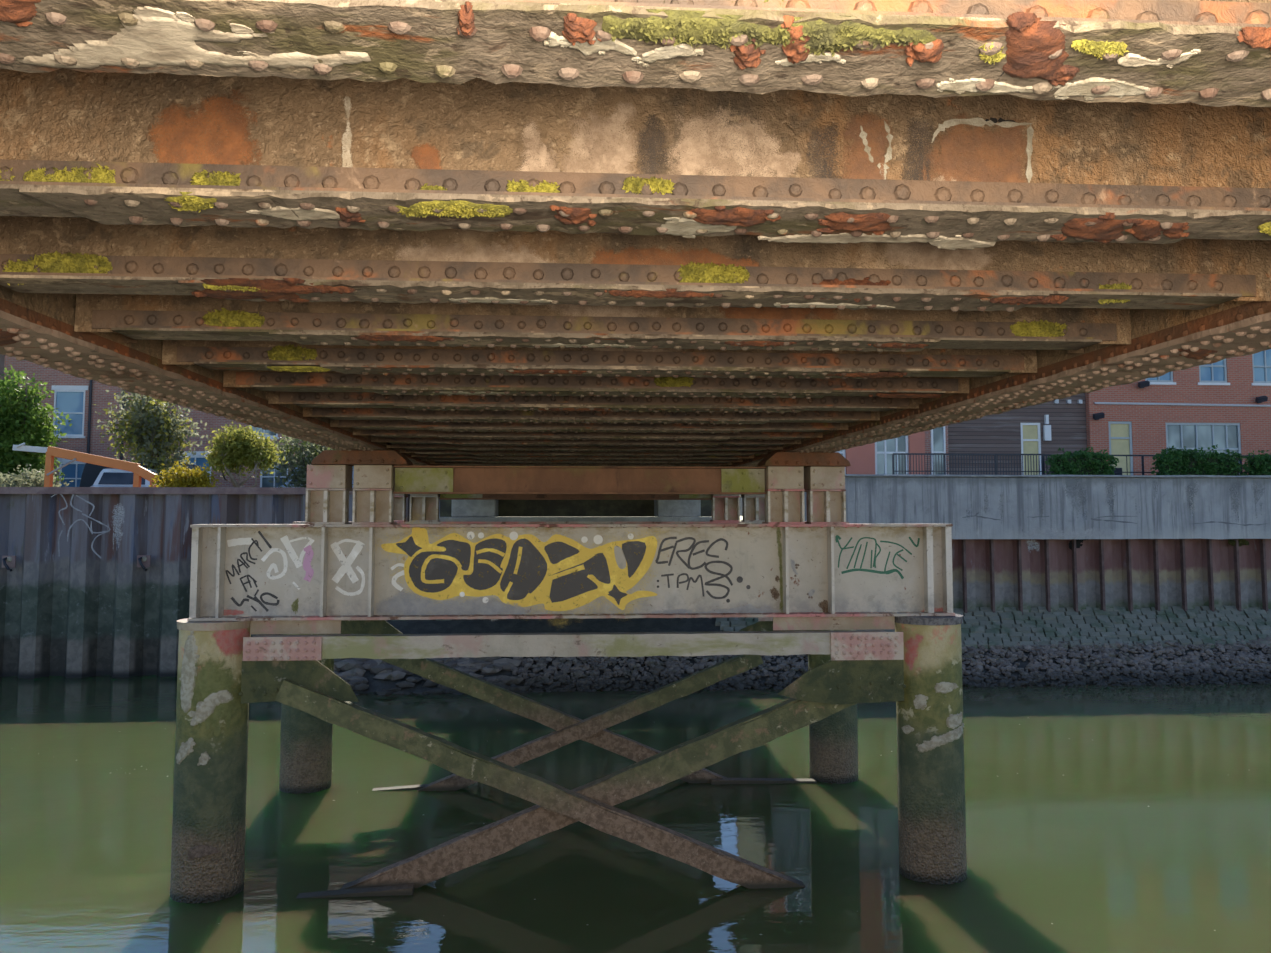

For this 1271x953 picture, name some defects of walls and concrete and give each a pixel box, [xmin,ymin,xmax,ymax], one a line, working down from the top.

rust [0,0,41,27]
peeling [18,6,371,69]
peeling [543,32,704,67]
peeling [775,52,846,67]
peeling [936,78,1034,94]
rust [1002,12,1080,87]
peeling [1052,49,1201,101]
rust [1050,212,1189,244]
peeling [176,631,233,766]
peeling [913,682,958,710]
peeling [901,712,964,753]